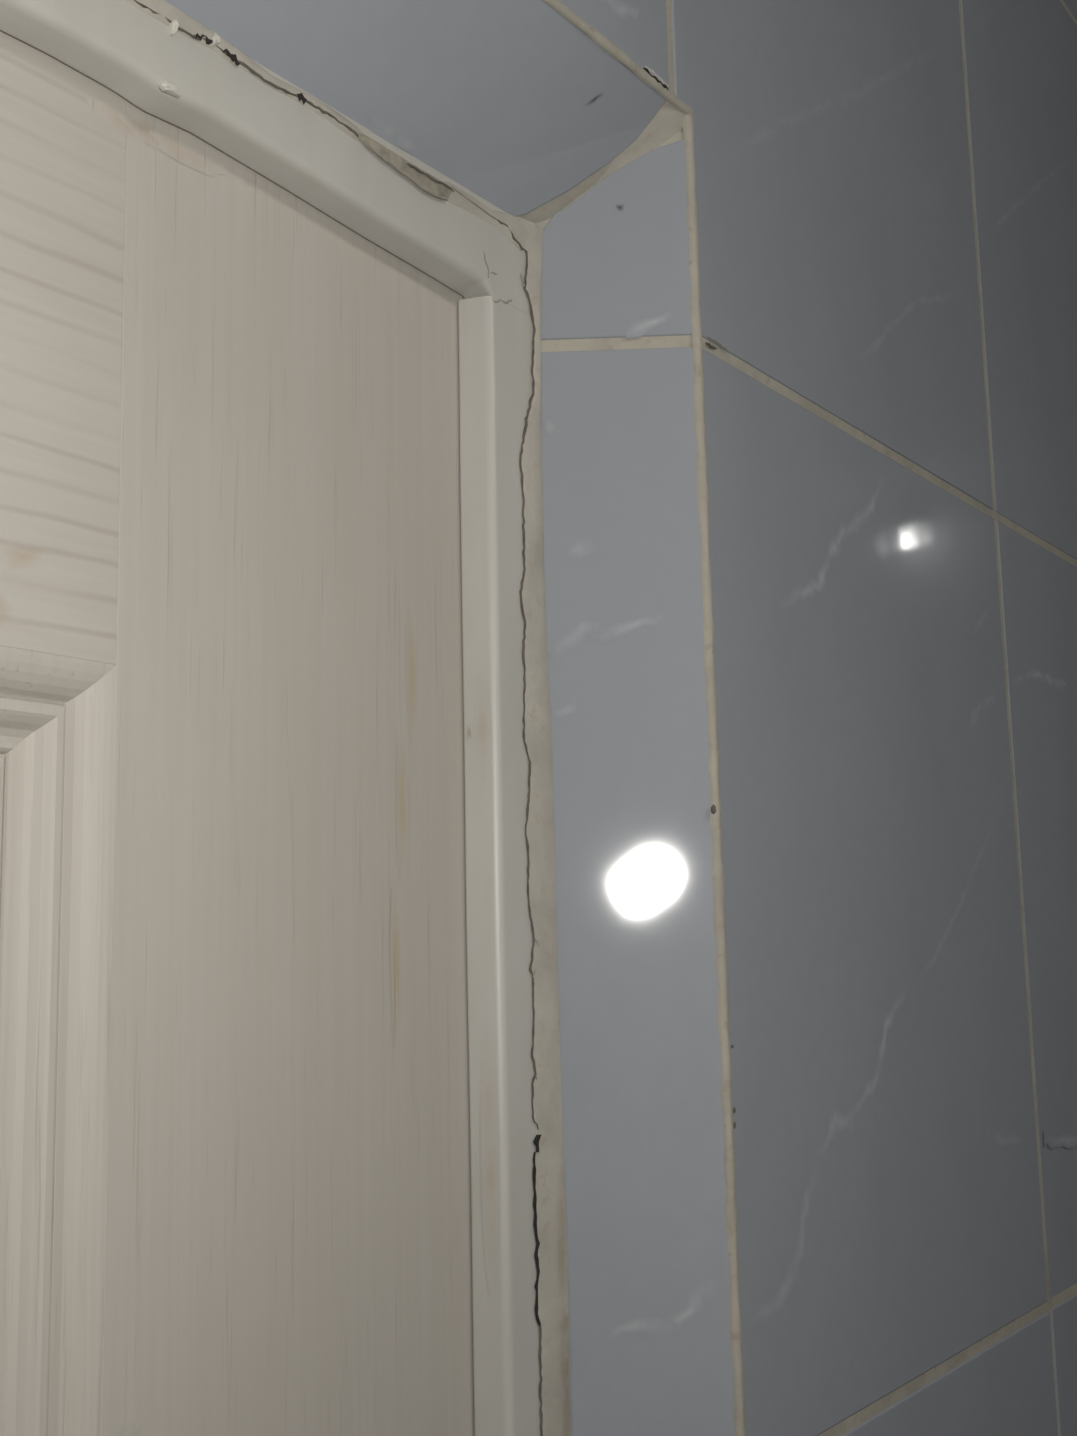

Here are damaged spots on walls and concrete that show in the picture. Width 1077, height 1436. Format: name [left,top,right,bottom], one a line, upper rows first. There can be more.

crack [134,0,359,137]
crack [447,184,543,1436]